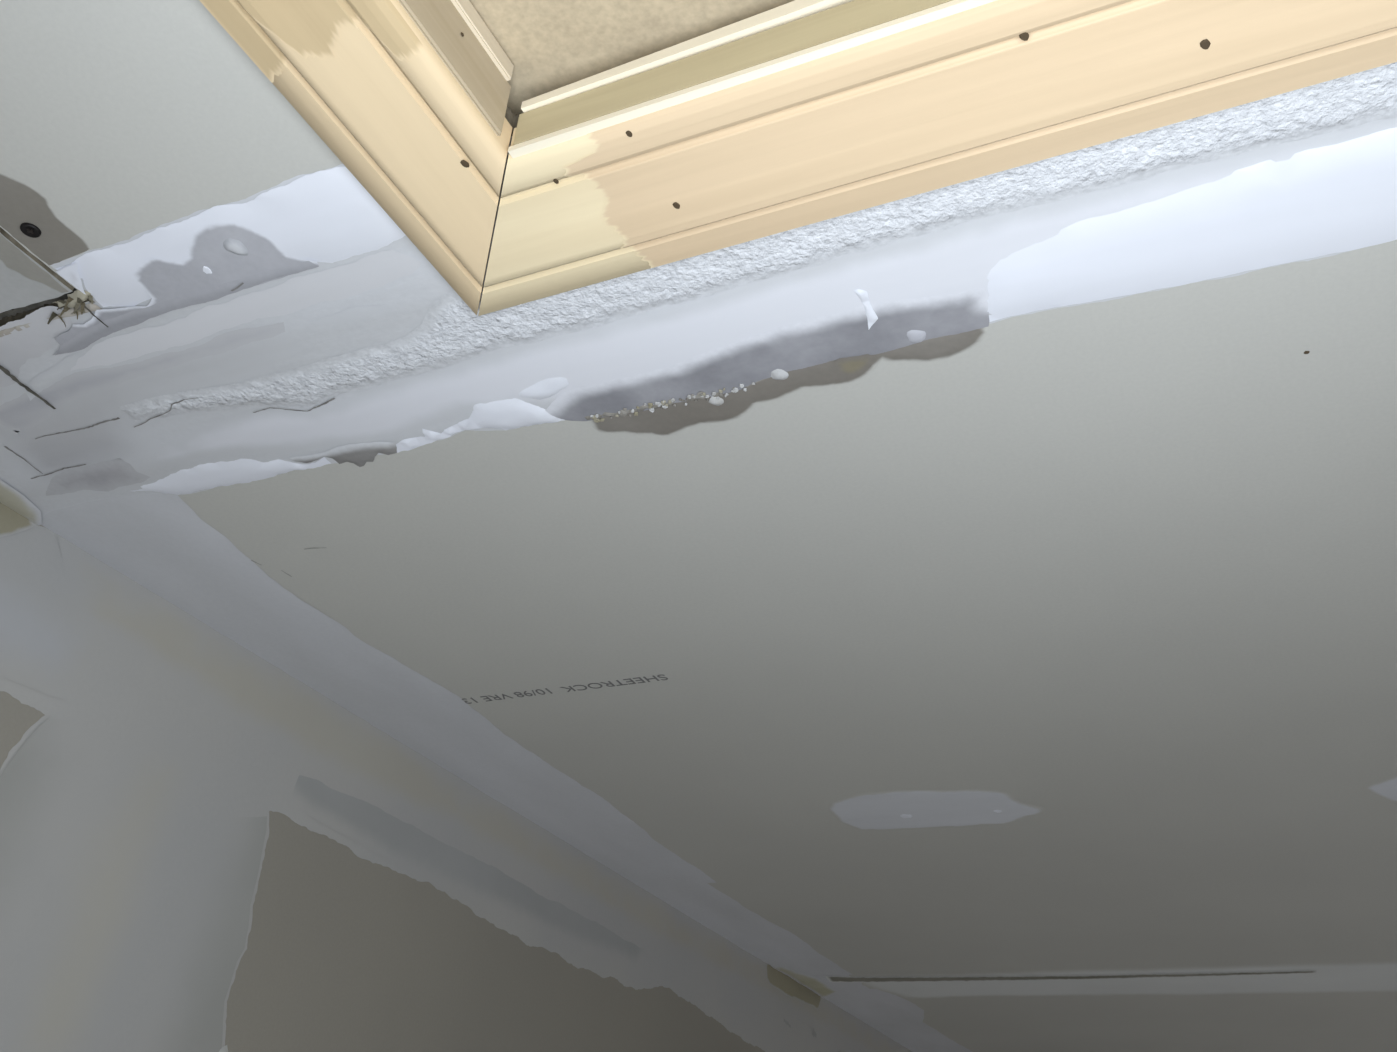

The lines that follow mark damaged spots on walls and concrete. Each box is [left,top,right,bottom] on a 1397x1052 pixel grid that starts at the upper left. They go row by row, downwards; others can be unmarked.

damp [0,172,90,293]
crack [0,288,108,327]
crack [0,365,196,479]
damp [53,222,319,355]
crack [253,398,335,413]
damp [545,287,989,437]